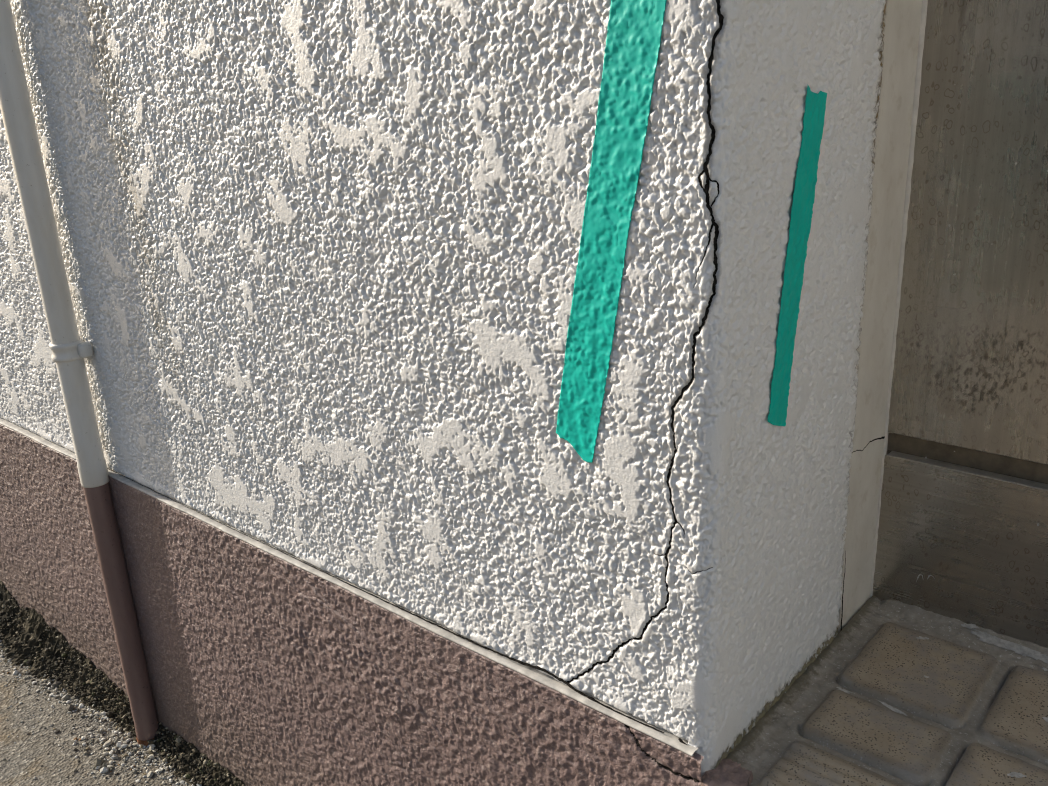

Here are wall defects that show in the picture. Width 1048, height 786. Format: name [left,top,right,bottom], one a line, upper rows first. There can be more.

crack [107,0,724,783]
crack [839,552,847,631]